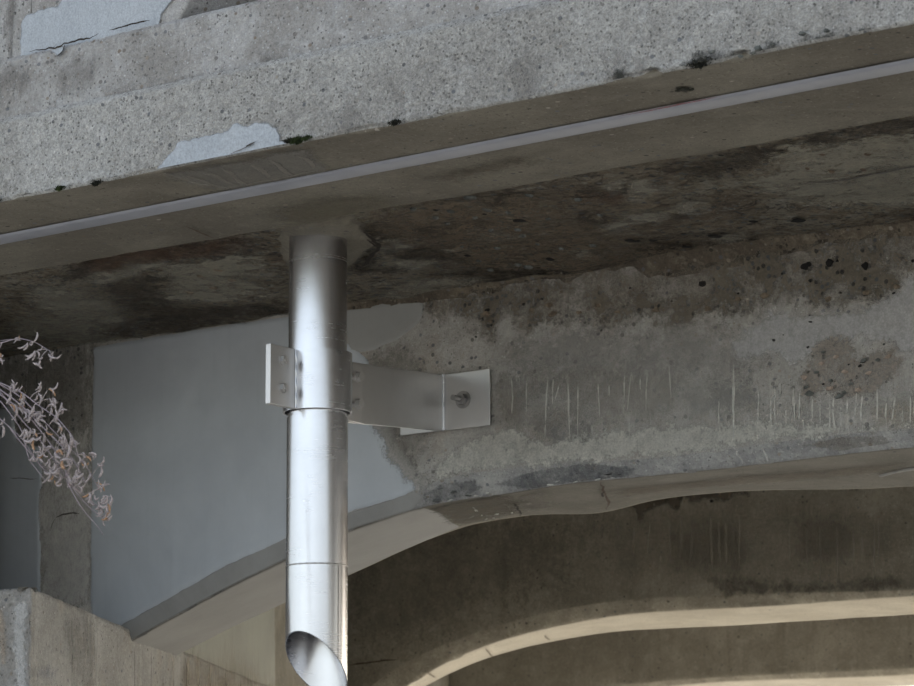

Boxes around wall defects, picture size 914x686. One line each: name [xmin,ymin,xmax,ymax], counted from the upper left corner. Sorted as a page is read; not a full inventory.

leakage [793,121,914,146]
leakage [58,243,287,334]
peeling [380,229,914,400]
leakage [430,371,914,481]
spalling [507,463,634,488]